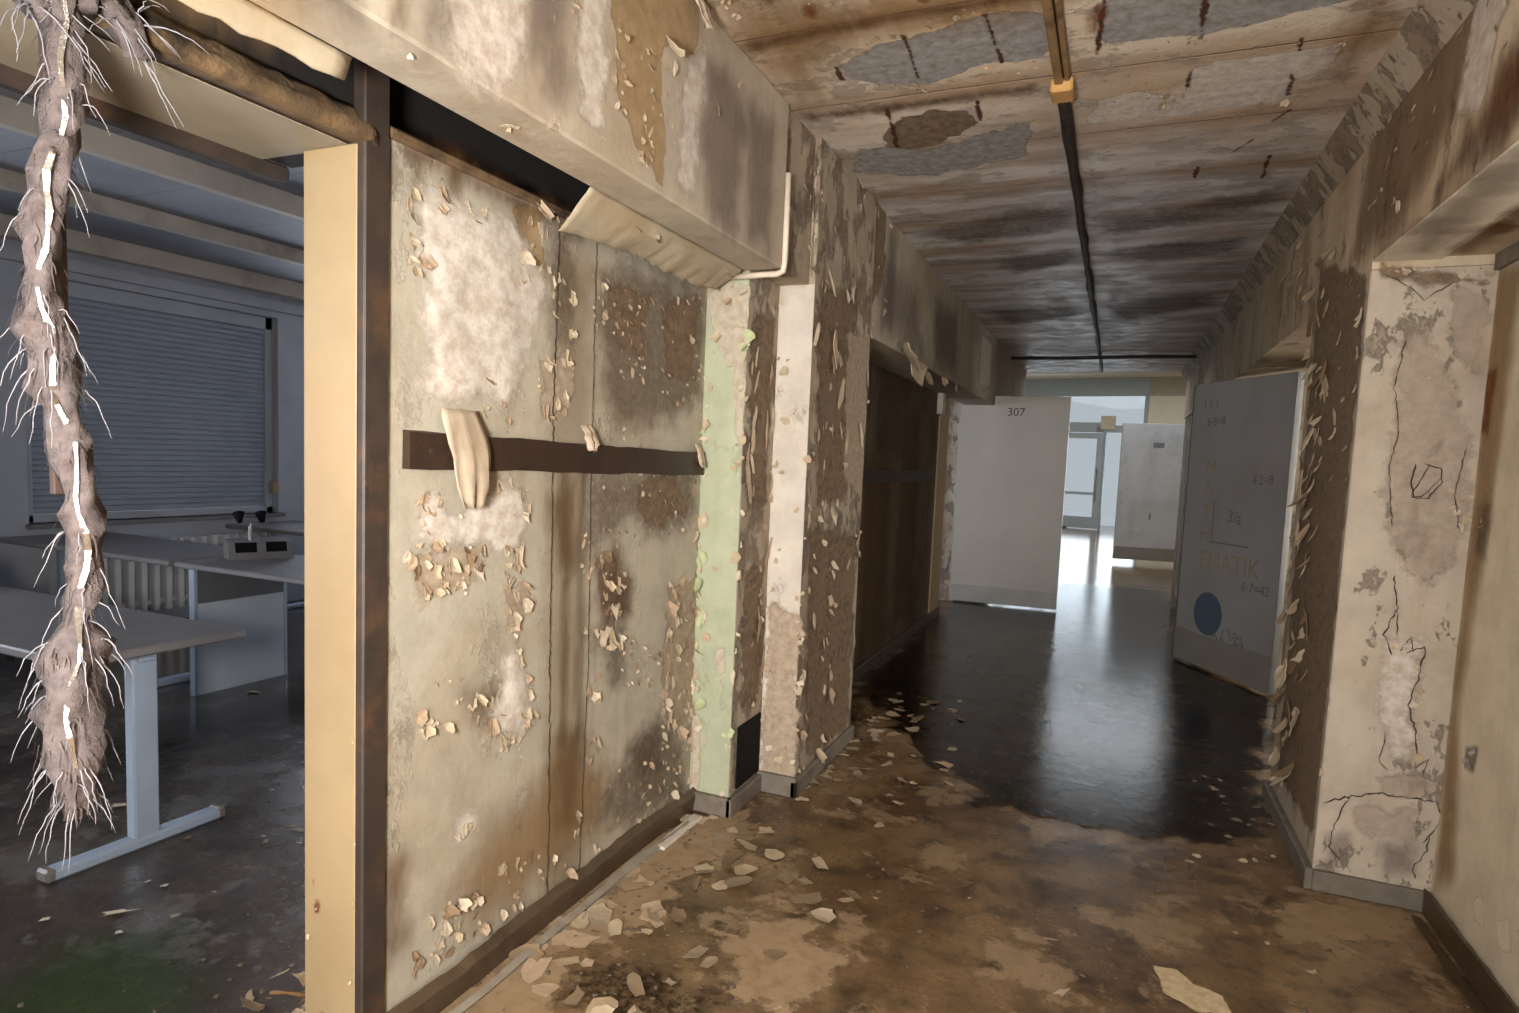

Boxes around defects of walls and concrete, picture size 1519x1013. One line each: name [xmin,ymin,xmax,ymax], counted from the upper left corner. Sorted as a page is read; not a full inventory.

water stain [721,0,961,74]
water stain [811,86,1031,118]
spalling [1095,0,1348,46]
peeling [402,397,536,635]
peeling [512,203,600,453]
water stain [592,474,700,537]
peeling [580,0,1049,800]
water stain [979,334,992,391]
peeling [1267,0,1507,832]
crack [1388,340,1472,533]
water stain [607,725,686,832]
crack [1319,576,1440,878]